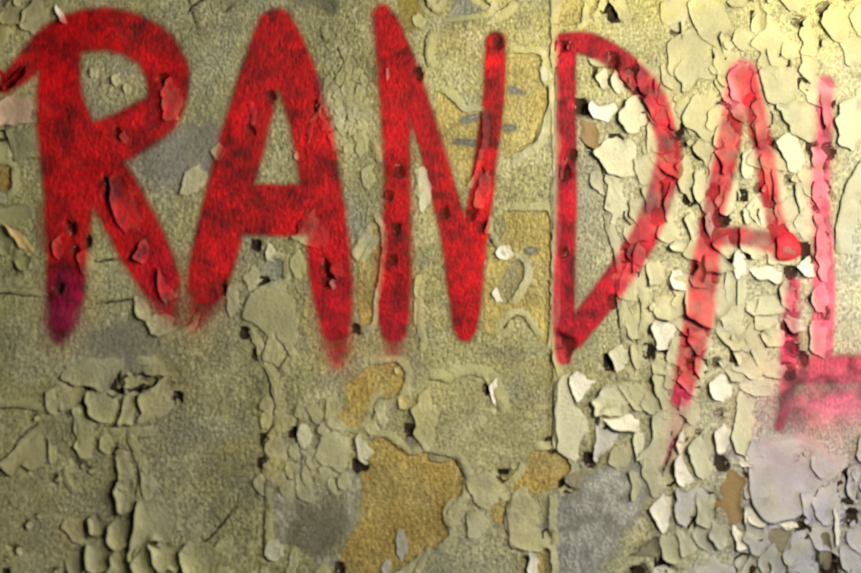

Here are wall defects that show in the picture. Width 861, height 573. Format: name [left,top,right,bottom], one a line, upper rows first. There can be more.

peeling [0,0,67,47]
peeling [0,64,45,199]
spalling [211,142,226,160]
spalling [247,101,257,137]
peeling [219,210,330,368]
peeling [251,0,861,573]
spalling [0,546,22,573]